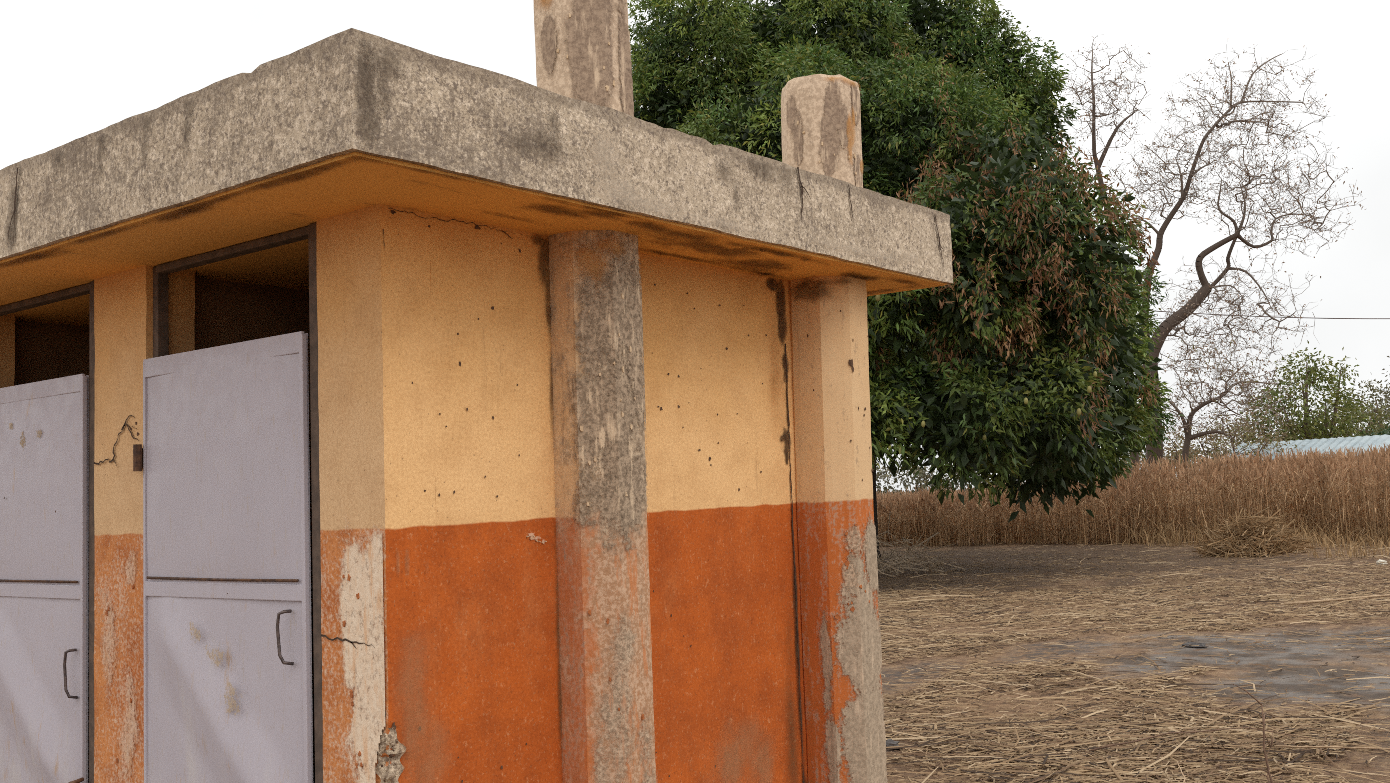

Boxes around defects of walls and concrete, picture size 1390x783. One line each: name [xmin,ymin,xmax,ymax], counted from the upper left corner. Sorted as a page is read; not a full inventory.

crack [383,208,522,247]
leakage [535,203,827,464]
leakage [846,274,912,295]
crack [93,415,139,466]
peeling [336,527,406,783]
leakage [794,567,802,727]
peeling [819,513,888,783]